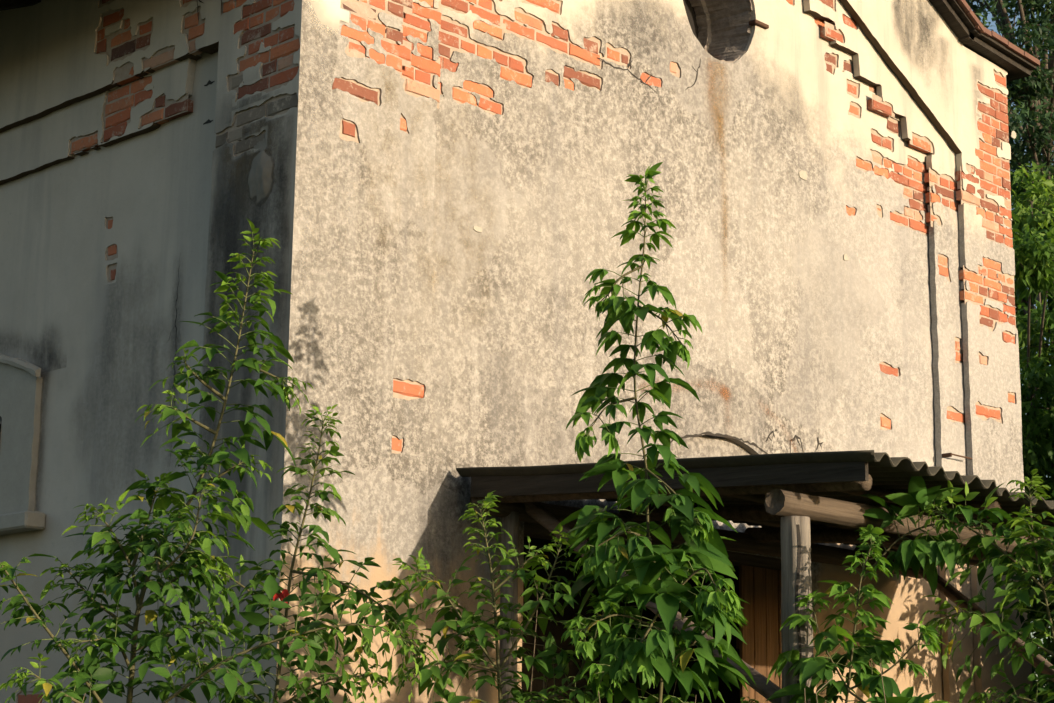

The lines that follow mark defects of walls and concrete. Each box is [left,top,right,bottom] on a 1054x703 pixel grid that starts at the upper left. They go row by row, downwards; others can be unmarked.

flaking render [70,0,205,155]
flaking render [215,0,300,157]
flaking render [339,119,359,143]
flaking render [332,78,380,106]
flaking render [340,0,680,115]
crack [599,58,653,90]
flaking render [814,0,1016,249]
flaking render [107,244,118,283]
flaking render [937,254,1016,344]